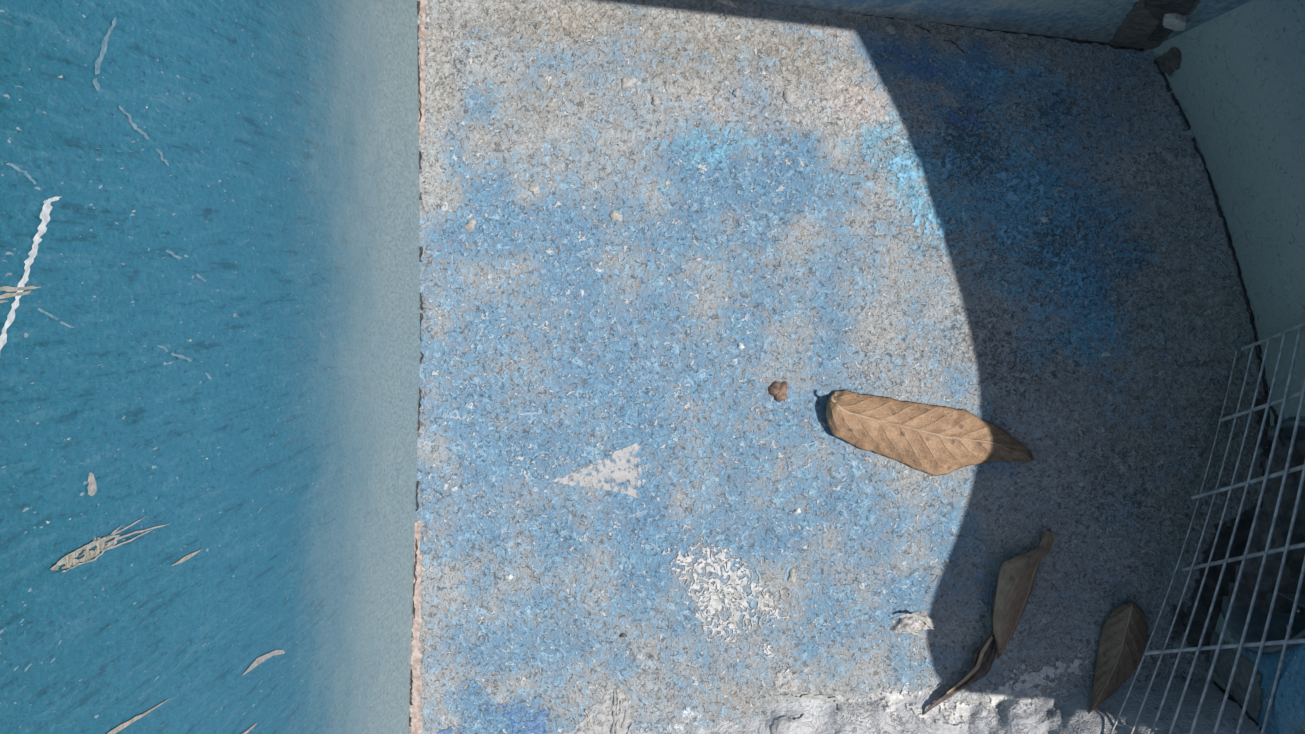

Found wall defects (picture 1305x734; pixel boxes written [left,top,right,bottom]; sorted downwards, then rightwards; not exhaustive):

peeling [0,286,75,328]
peeling [48,517,170,581]